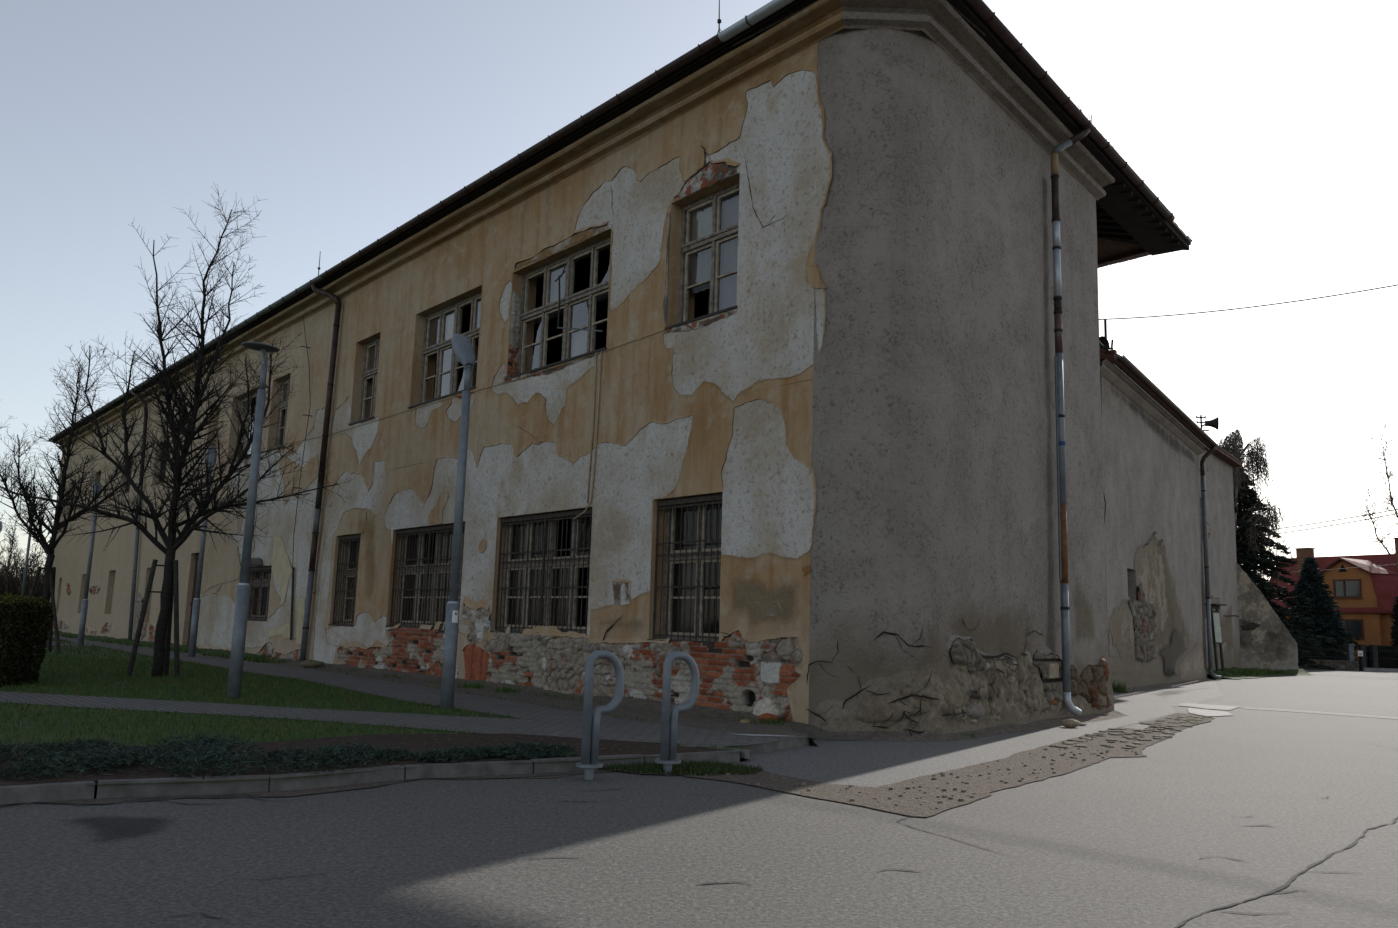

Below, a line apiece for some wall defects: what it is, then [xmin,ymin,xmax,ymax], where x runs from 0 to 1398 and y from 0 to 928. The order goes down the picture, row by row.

flaking render [196,68,1168,733]
crack [807,618,1044,736]